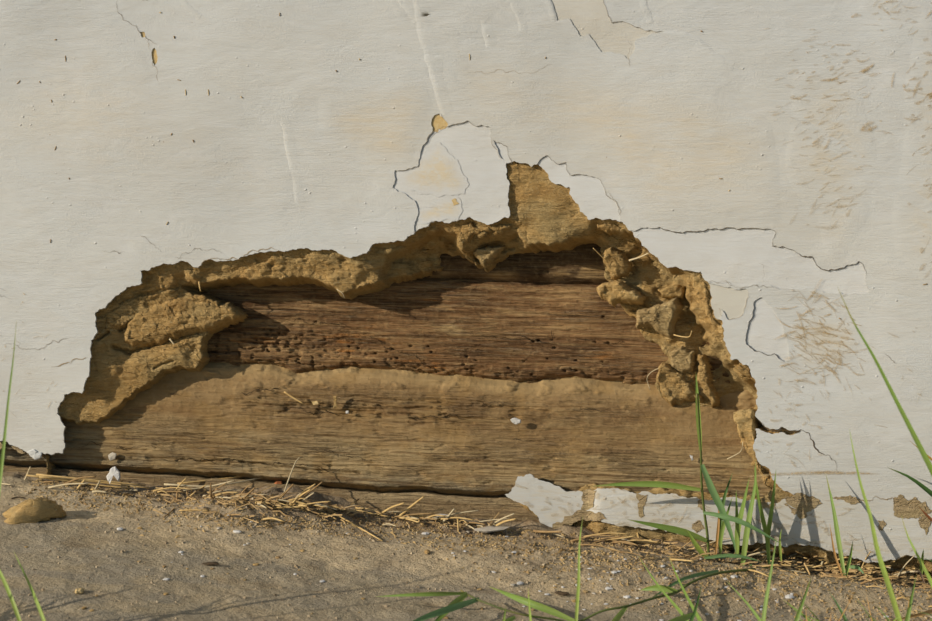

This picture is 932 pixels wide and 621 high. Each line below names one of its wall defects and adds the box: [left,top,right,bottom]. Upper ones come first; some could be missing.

crack [647,227,866,279]
spalling [58,114,869,519]
crack [713,265,789,360]
spalling [552,488,606,529]
spalling [692,499,704,533]